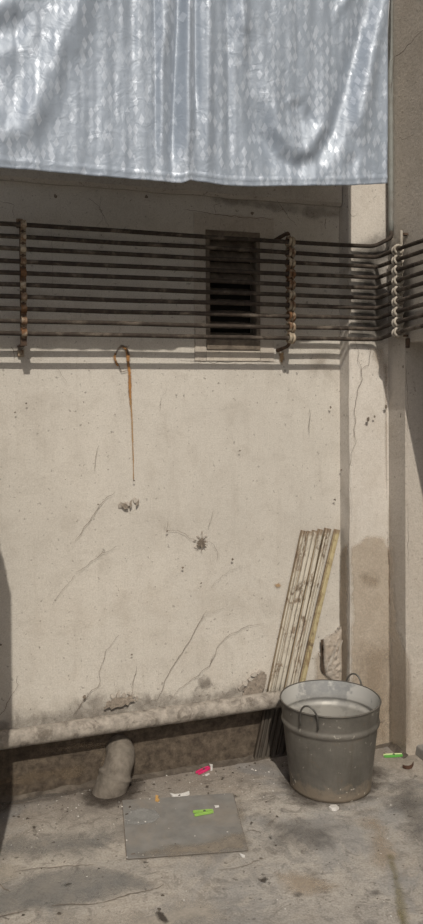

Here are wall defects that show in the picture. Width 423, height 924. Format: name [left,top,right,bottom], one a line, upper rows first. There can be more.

corrosion [114,345,134,480]
crack [144,609,258,705]
peeling [238,669,267,695]
water stain [339,538,410,746]